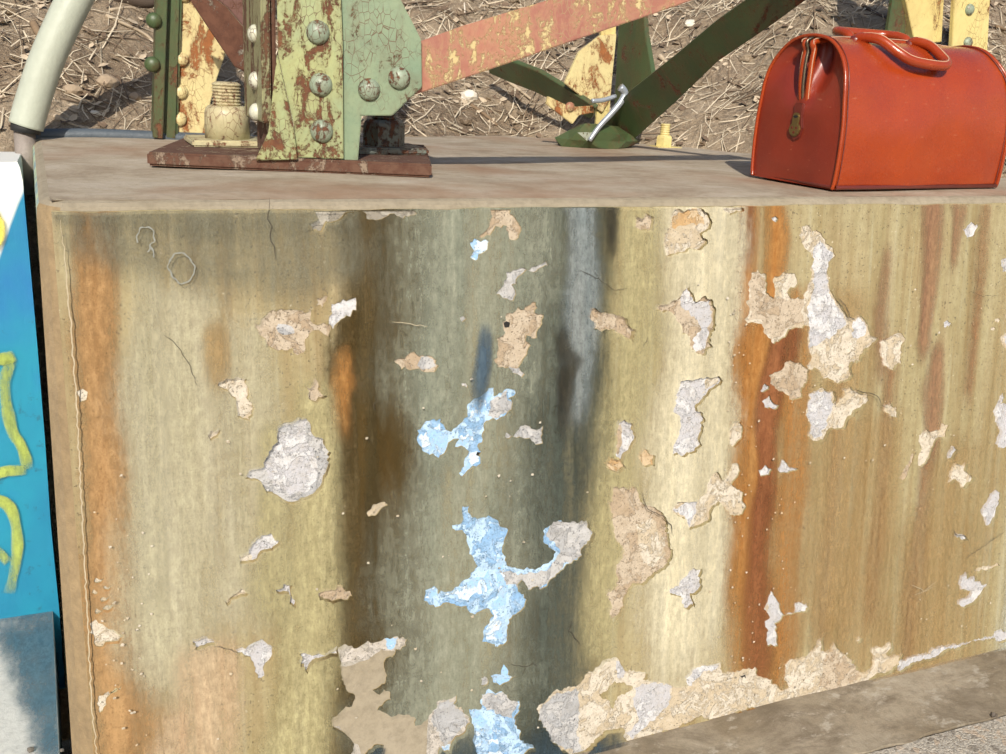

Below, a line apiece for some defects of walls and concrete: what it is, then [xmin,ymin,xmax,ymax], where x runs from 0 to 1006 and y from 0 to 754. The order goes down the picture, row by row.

rust [70,211,237,754]
peeling [246,417,329,502]
rust [332,354,353,428]
damp [91,206,743,754]
peeling [417,388,516,476]
peeling [494,261,547,377]
rust [723,206,809,685]
peeling [744,225,905,441]
peeling [424,506,593,647]
peeling [301,636,406,670]
peeling [426,664,534,754]
peeling [537,628,1006,754]